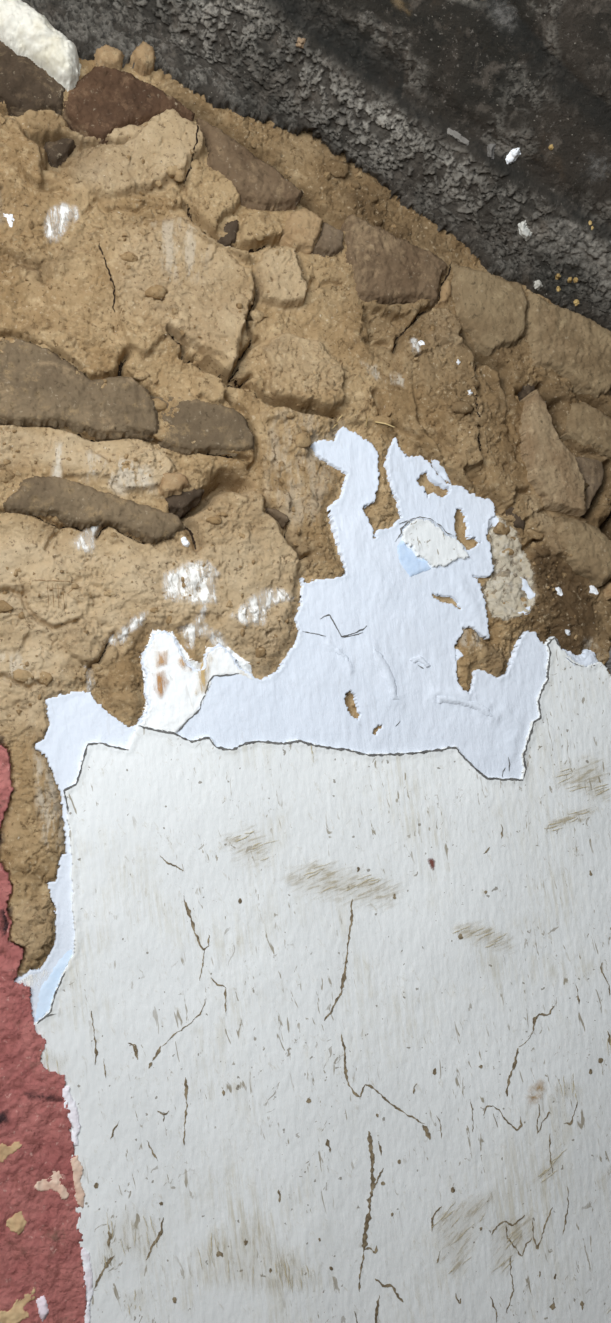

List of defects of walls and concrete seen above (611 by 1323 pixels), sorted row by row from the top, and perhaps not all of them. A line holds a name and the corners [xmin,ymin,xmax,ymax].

crack [98,242,115,312]
crack [169,297,257,398]
spalling [0,58,611,1022]
crack [91,856,226,1077]
spalling [0,1141,22,1162]
peeling [34,1086,85,1208]
crack [148,1077,188,1158]
crack [324,899,610,1323]
spalling [6,1211,27,1235]
crack [95,1225,114,1287]
crack [146,1217,164,1260]
spalling [0,1287,49,1323]